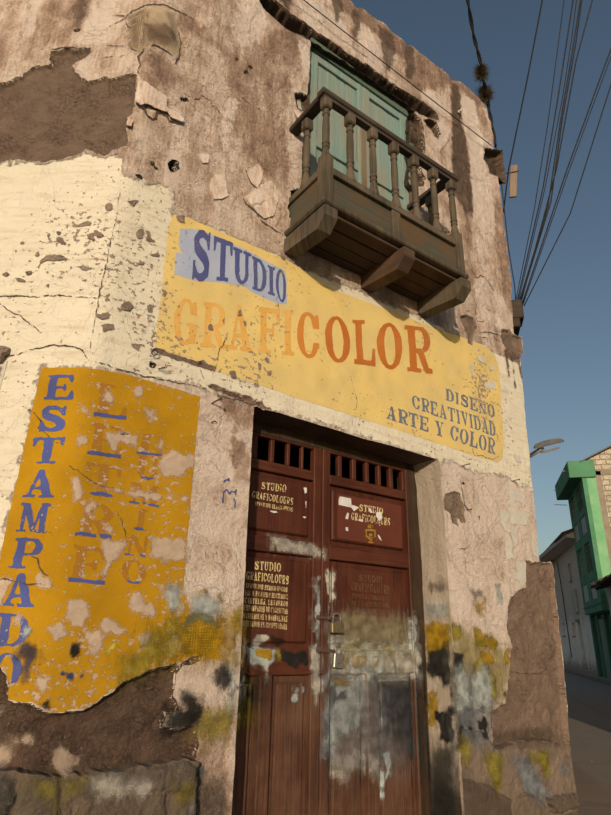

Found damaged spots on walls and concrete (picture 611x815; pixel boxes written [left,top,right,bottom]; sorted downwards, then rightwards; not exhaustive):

flaking render [0,46,184,163]
water stain [332,0,360,38]
water stain [378,25,395,70]
water stain [406,46,415,79]
water stain [452,84,473,213]
crack [0,195,251,405]
peeling [156,439,195,477]
flaking render [444,482,466,526]
peeling [48,599,125,655]
flaking render [491,488,570,748]
flaking render [0,655,203,774]
water stain [453,653,488,746]